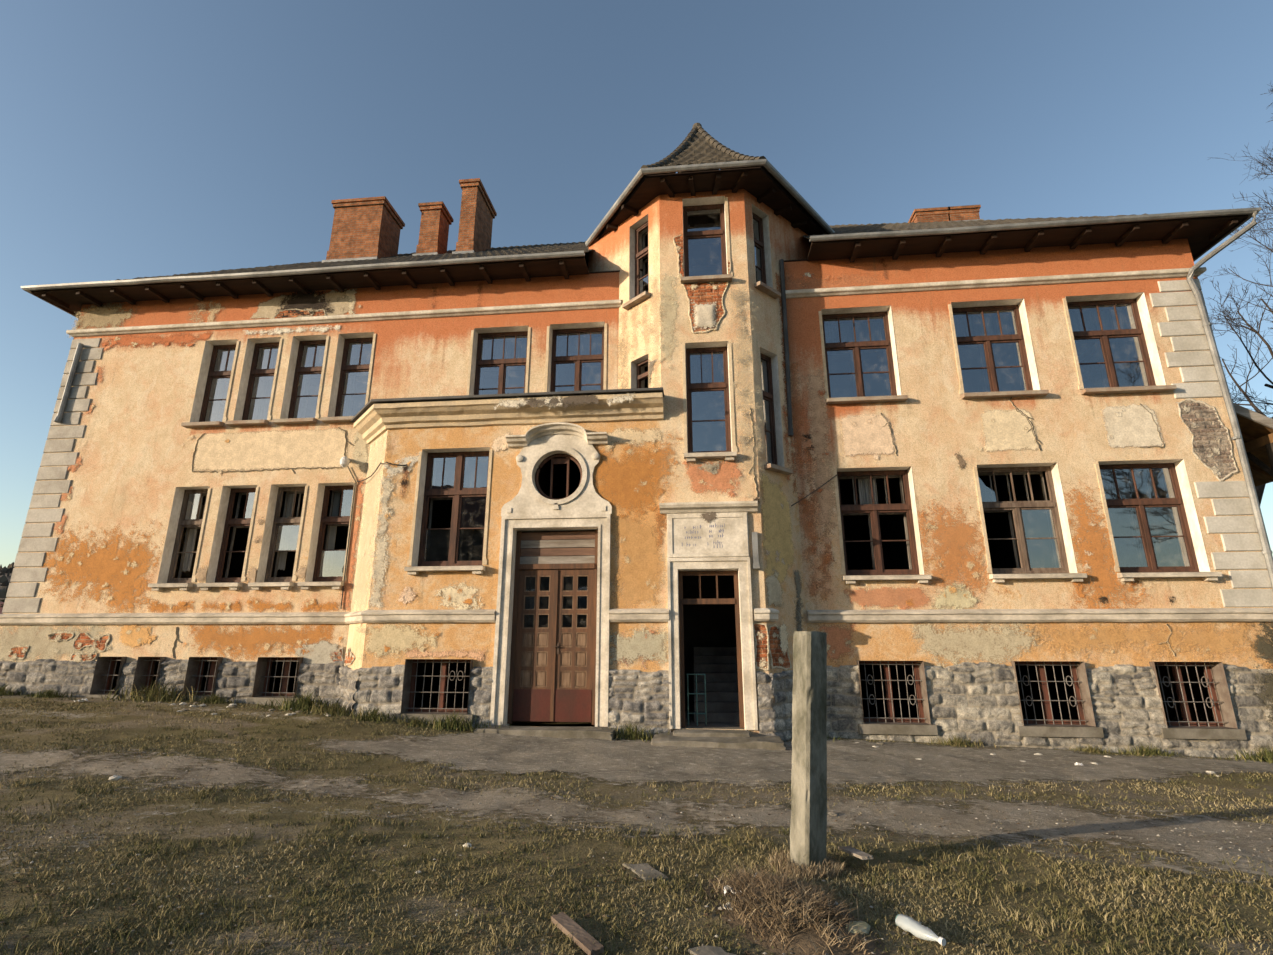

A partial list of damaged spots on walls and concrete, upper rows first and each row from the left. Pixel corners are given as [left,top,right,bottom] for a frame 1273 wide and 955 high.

flaking render [648,234,751,385]
crack [172,627,181,658]
peeling [40,456,488,666]
peeling [593,426,743,609]
peeling [753,474,856,671]
flaking render [1176,398,1239,482]